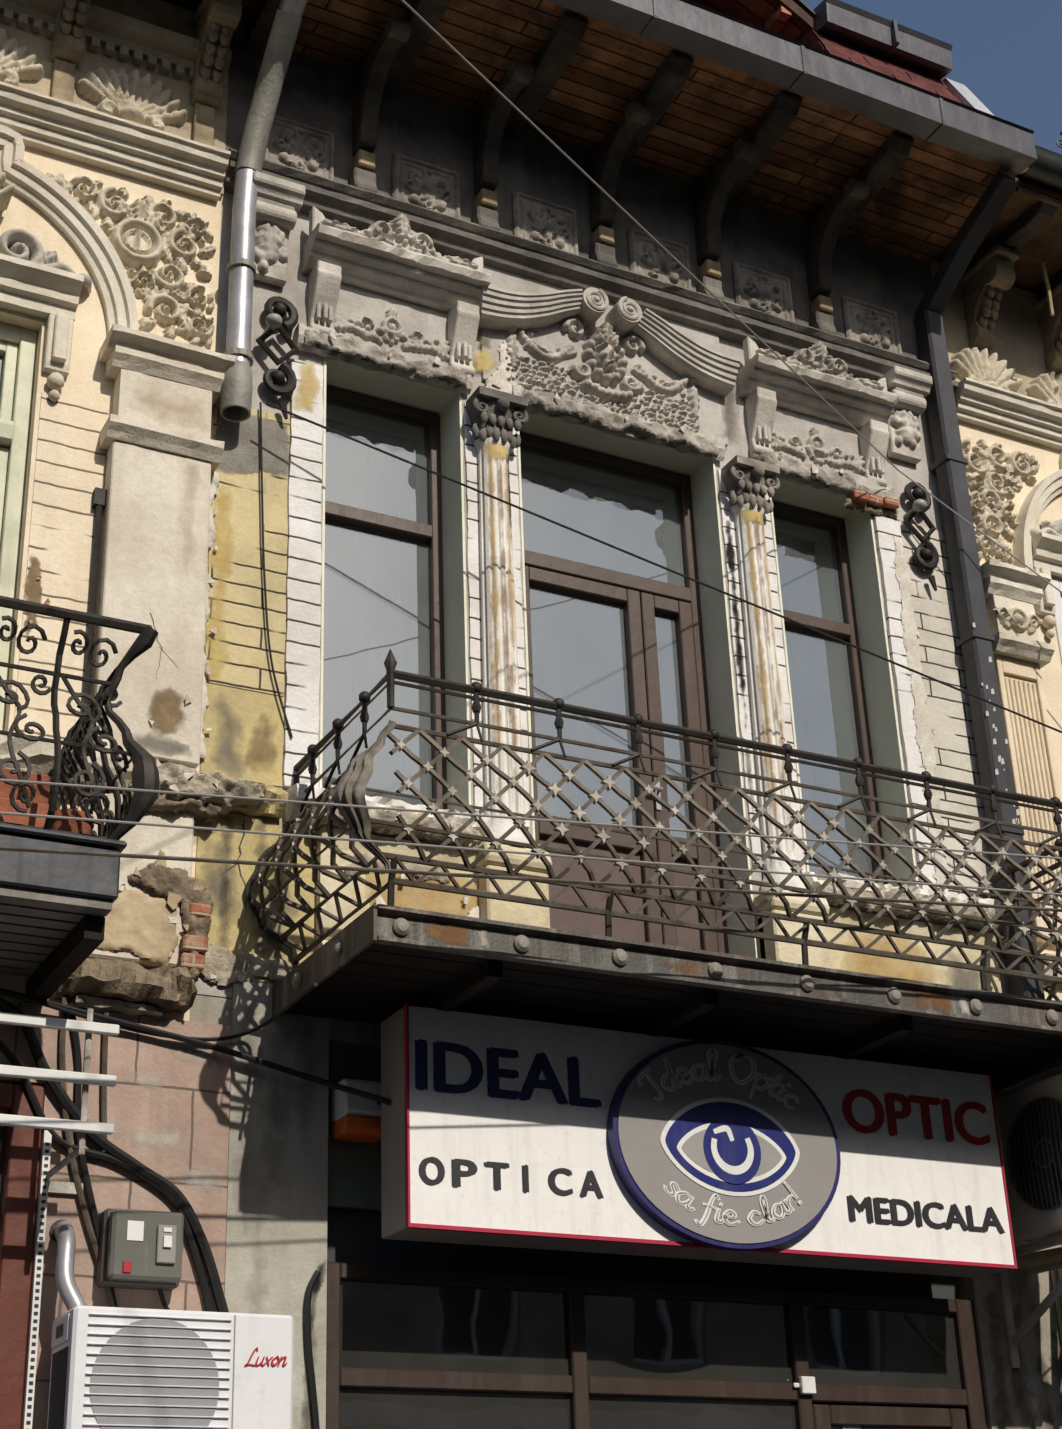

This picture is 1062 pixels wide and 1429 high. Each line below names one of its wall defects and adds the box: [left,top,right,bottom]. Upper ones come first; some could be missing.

spalling [52,850,301,1018]